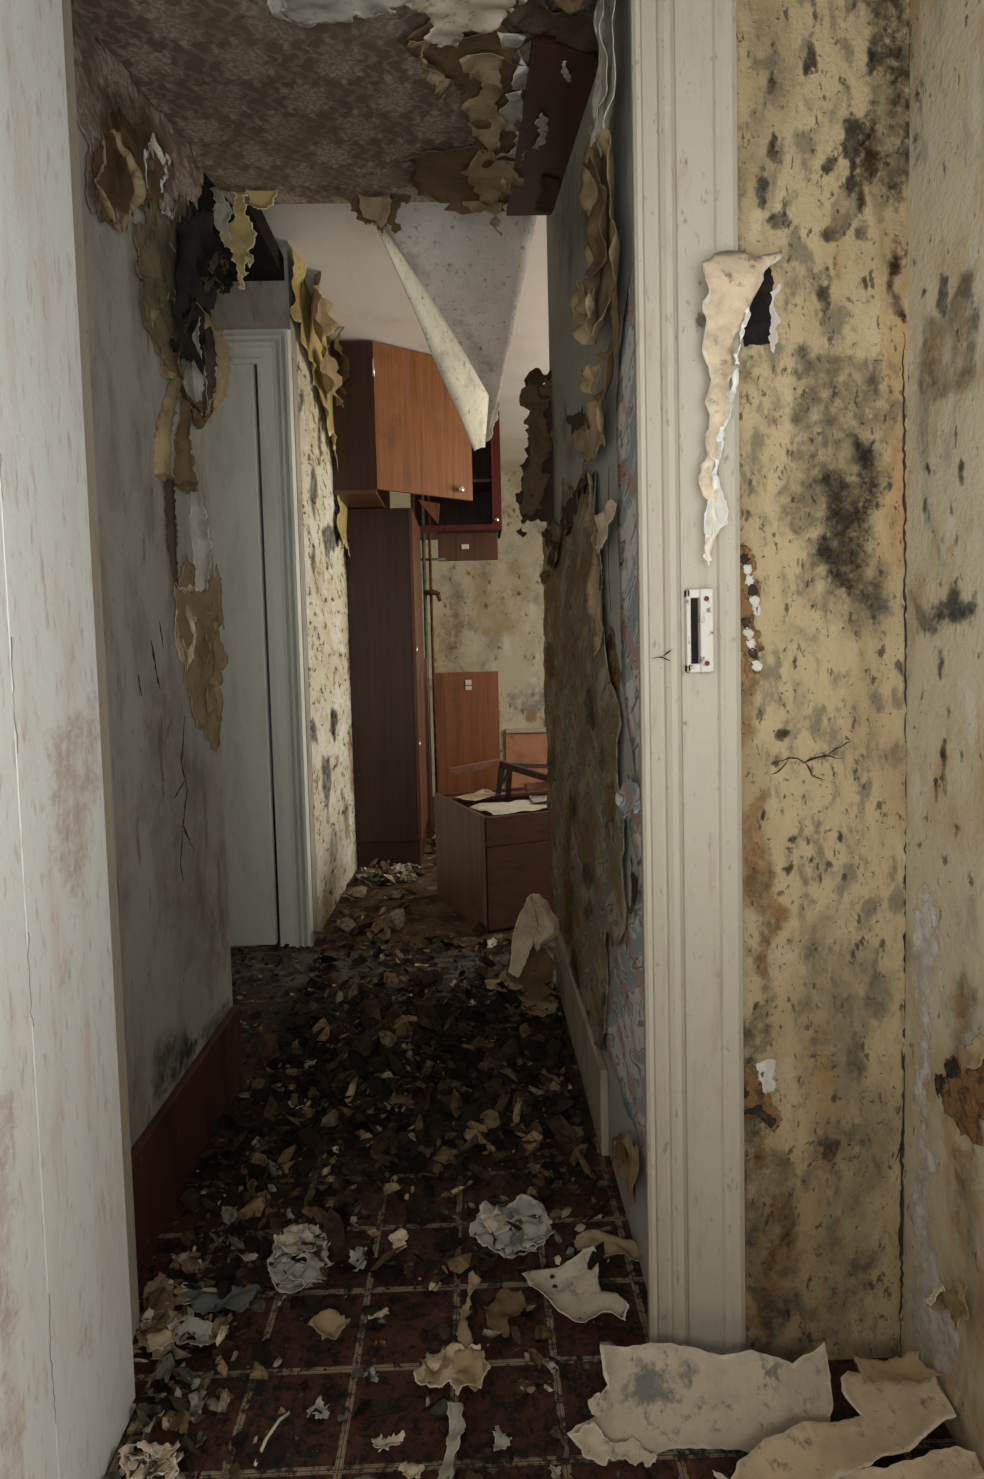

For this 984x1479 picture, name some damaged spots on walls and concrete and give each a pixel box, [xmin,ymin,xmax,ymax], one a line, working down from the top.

peeling [267,0,527,48]
peeling [550,0,585,15]
leakage [803,45,817,73]
leakage [822,119,869,195]
leakage [756,178,788,229]
spalling [743,267,781,354]
leakage [817,285,830,305]
leakage [922,274,948,317]
leakage [819,442,884,590]
spalling [606,626,620,690]
leakage [934,739,947,788]
spalling [626,854,639,919]